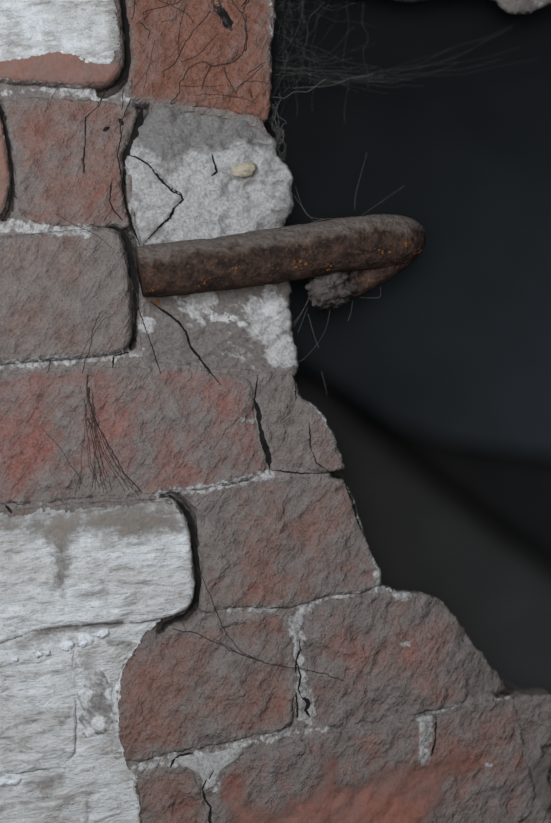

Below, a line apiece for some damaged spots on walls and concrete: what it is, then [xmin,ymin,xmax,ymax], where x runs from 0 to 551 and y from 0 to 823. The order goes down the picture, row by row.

peeling [0,50,120,85]
peeling [0,122,8,208]
crack [109,108,221,385]
corrosion [135,214,426,305]
crack [254,377,364,535]
peeling [115,639,141,764]
crack [295,639,311,718]